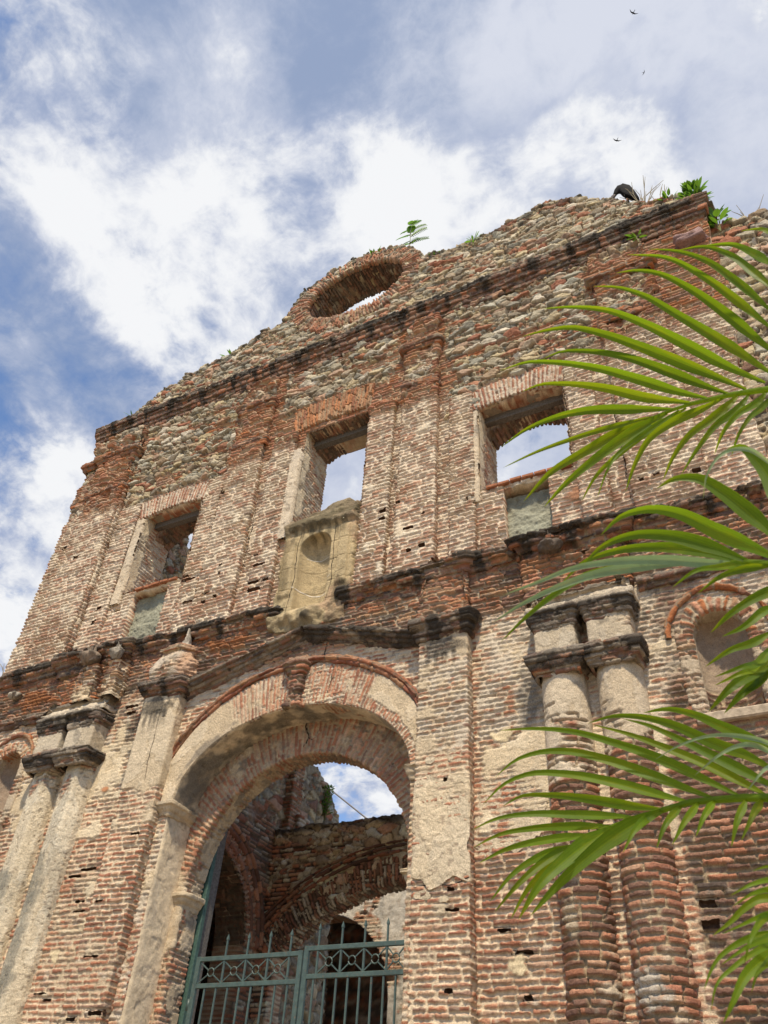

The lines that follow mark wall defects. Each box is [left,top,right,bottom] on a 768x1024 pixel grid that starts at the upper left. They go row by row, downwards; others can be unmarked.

leakage [172,664,284,758]
leakage [307,654,419,704]
leakage [178,736,231,812]
peeling [411,754,547,912]